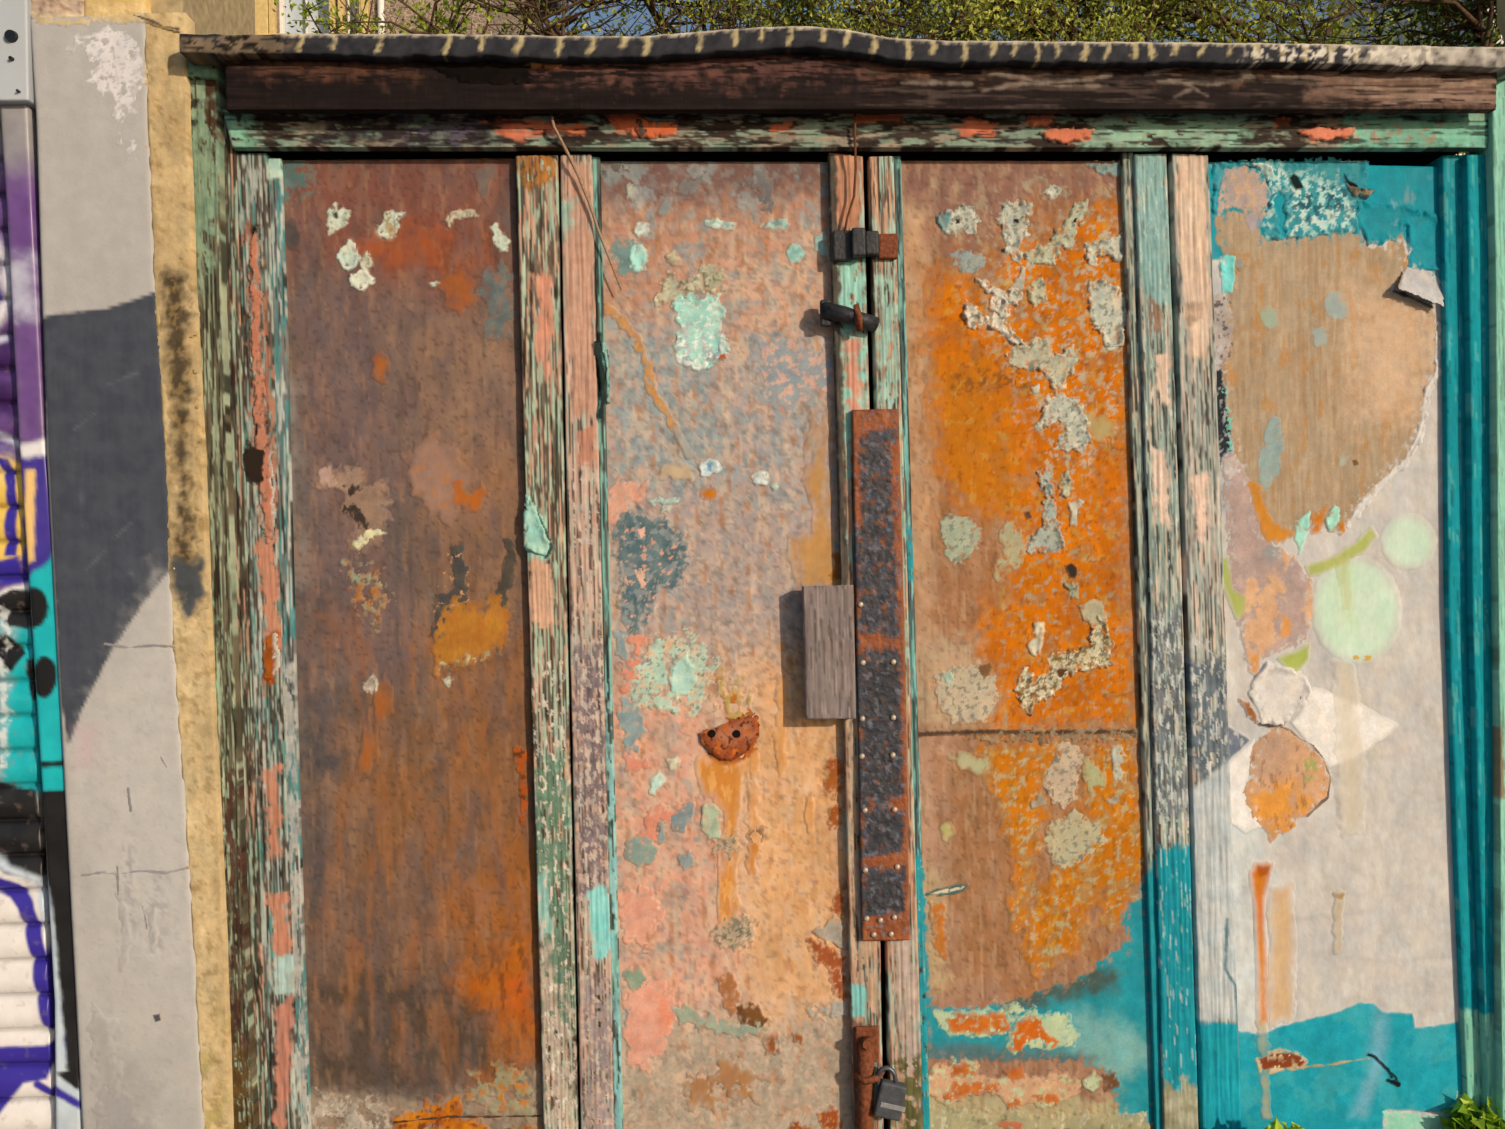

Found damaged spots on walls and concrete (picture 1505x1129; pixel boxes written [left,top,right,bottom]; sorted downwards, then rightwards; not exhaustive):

peeling [325,201,406,292]
peeling [444,208,511,253]
peeling [606,221,731,373]
peeling [932,184,1127,726]
peeling [1210,125,1444,844]
peeling [613,626,721,723]
rust [693,660,790,926]
rust [439,909,541,1070]
peeling [620,912,852,1129]
peeling [805,881,850,1002]
peeling [928,1001,1154,1129]
rust [1248,859,1298,1120]